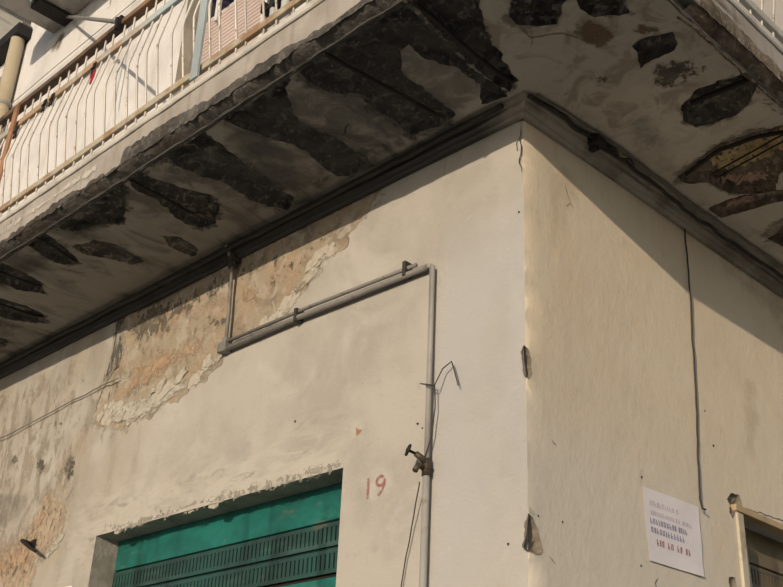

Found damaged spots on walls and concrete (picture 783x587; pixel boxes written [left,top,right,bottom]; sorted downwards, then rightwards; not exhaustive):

spalling [502,0,566,30]
spalling [577,0,634,17]
spalling [632,32,678,69]
spalling [676,0,783,128]
spalling [0,0,519,295]
spalling [674,125,783,218]
spalling [0,298,49,324]
peeling [85,190,380,438]
flaking render [521,345,532,379]
peeling [0,365,71,587]
mould [64,456,75,480]
flaking render [522,507,543,555]